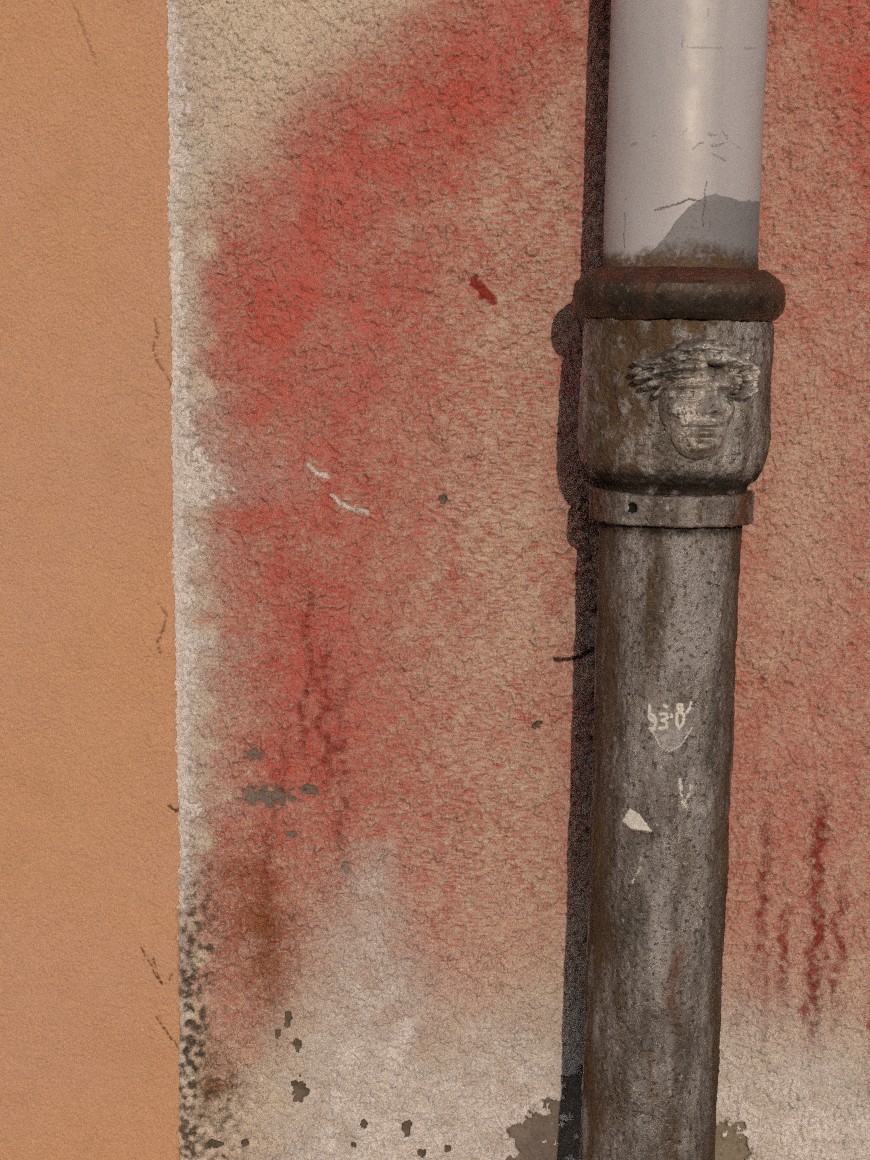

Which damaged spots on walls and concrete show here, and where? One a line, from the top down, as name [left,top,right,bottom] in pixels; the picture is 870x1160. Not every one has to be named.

peeling [275,1011,302,1052]
peeling [291,1075,310,1103]
peeling [401,1120,413,1137]
peeling [506,1064,583,1160]
peeling [715,1117,755,1160]